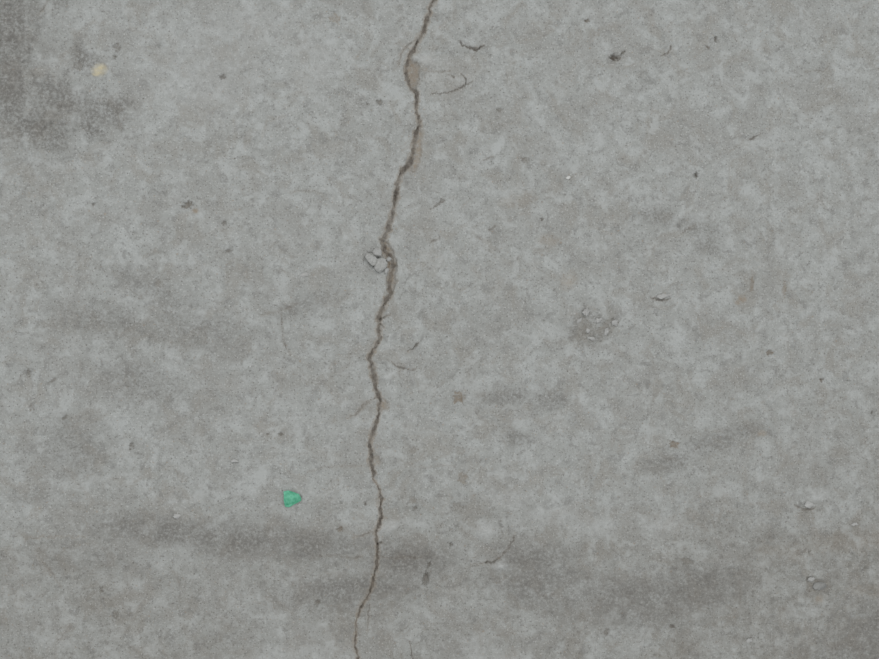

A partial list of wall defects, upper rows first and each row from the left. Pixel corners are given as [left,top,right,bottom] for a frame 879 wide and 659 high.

crack [317,0,474,659]